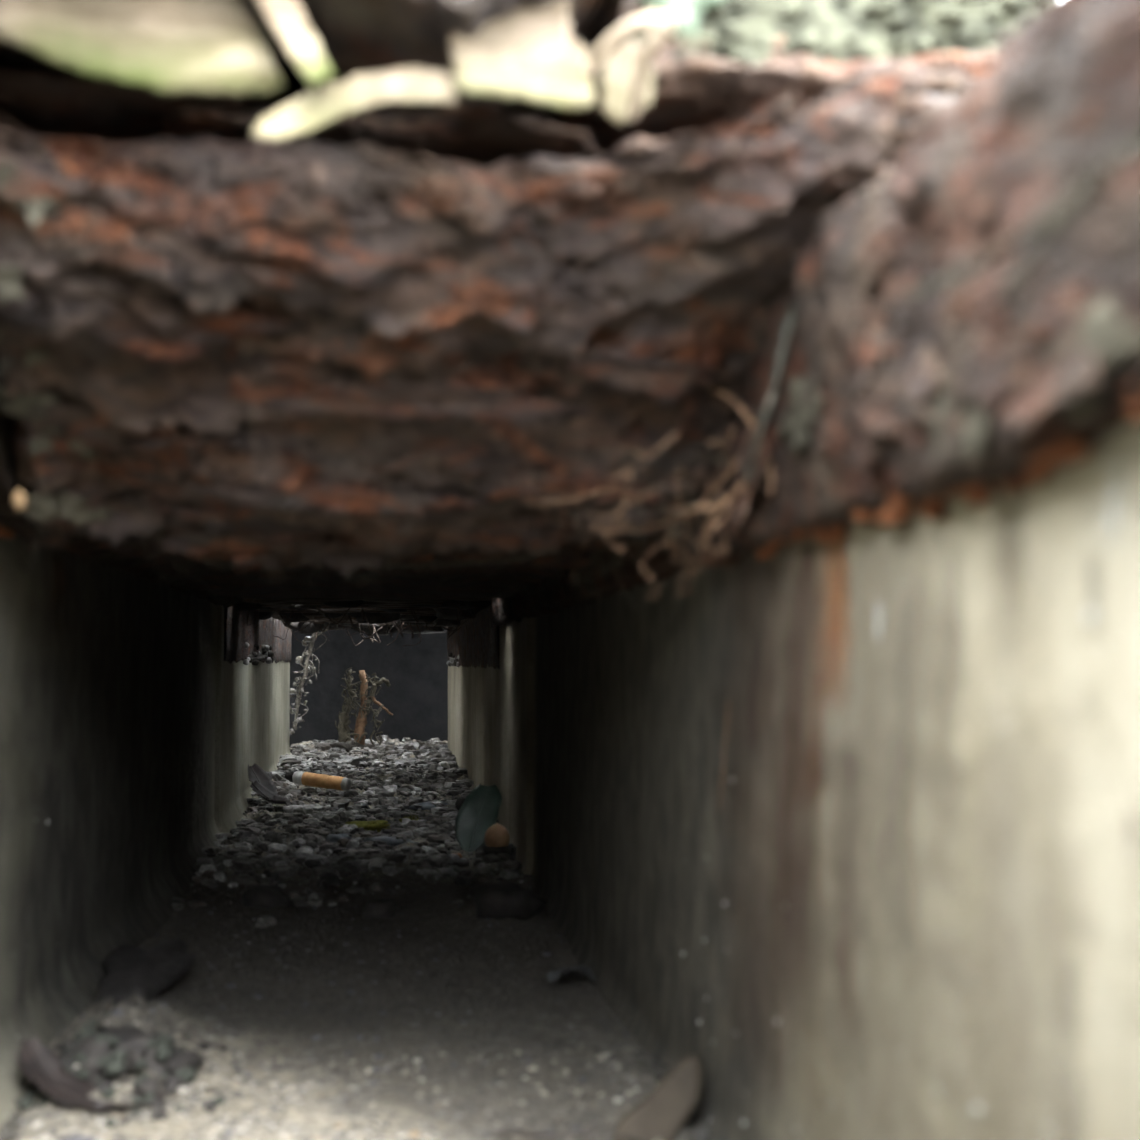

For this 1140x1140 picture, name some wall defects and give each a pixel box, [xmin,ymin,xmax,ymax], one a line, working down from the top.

corrosion [188,211,498,290]
corrosion [0,260,308,364]
corrosion [470,281,608,337]
corrosion [116,428,320,456]
corrosion [257,380,591,422]
corrosion [566,348,729,408]
corrosion [775,376,827,457]
corrosion [849,286,1140,471]
corrosion [64,493,388,575]
corrosion [179,484,481,517]
corrosion [729,431,753,536]